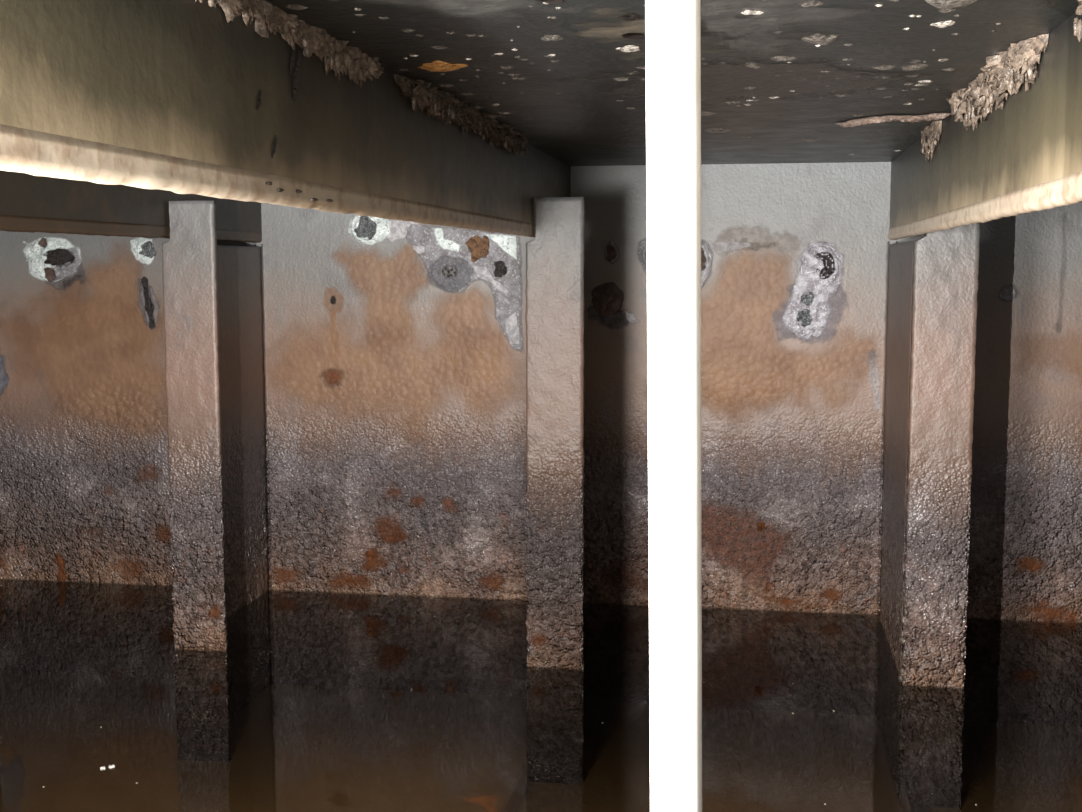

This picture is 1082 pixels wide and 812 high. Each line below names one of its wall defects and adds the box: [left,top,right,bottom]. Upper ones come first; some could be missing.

corrosion [406,224,523,352]
corrosion [701,254,872,417]
corrosion [334,520,404,587]